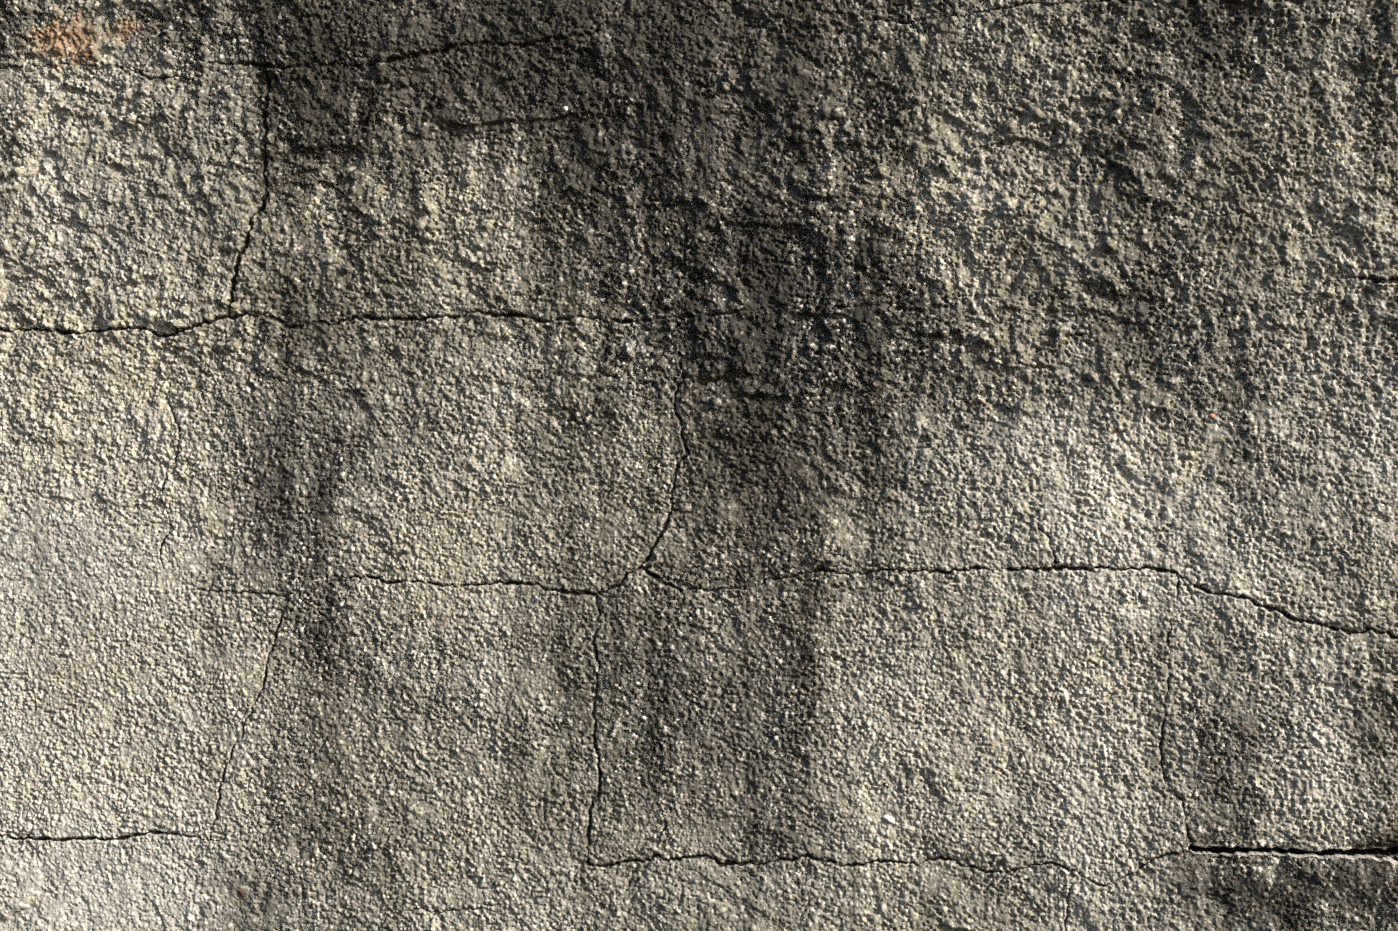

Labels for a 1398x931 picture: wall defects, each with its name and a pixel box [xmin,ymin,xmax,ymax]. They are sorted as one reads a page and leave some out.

crack [874,0,1136,24]
crack [0,0,797,338]
crack [160,383,181,569]
damp [185,0,864,838]
crack [834,286,934,308]
crack [1039,322,1176,338]
crack [1330,276,1398,284]
crack [0,589,298,842]
crack [328,338,1398,931]
damp [1188,819,1398,930]